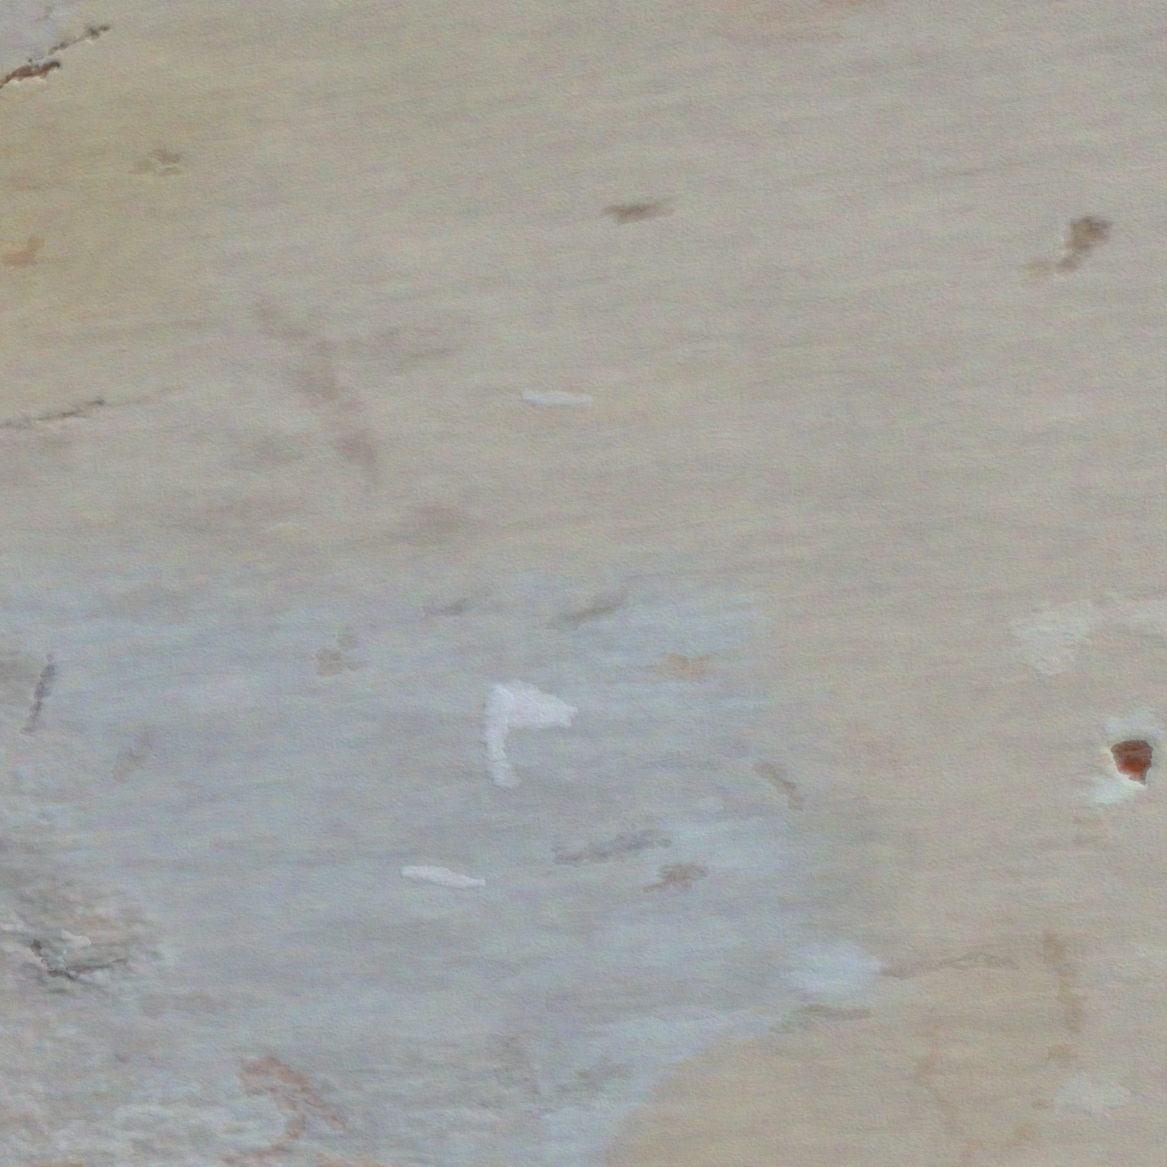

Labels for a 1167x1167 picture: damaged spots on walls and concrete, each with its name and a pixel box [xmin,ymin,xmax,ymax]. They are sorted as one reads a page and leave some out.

crack [0,26,110,107]
crack [0,382,188,498]
crack [0,625,58,737]
peeling [0,507,914,1167]